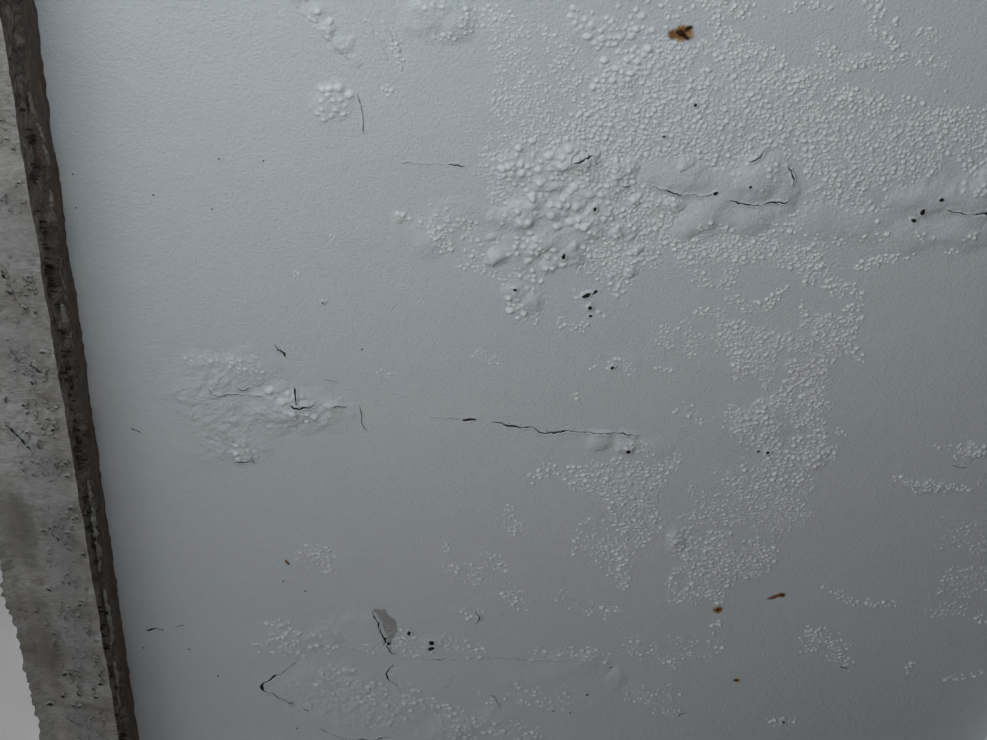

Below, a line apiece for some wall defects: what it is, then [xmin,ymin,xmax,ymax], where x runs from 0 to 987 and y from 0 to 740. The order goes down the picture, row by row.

corrosion [668,26,692,41]
crack [621,144,797,210]
crack [946,207,987,220]
crack [428,415,640,440]
peeling [371,609,411,645]